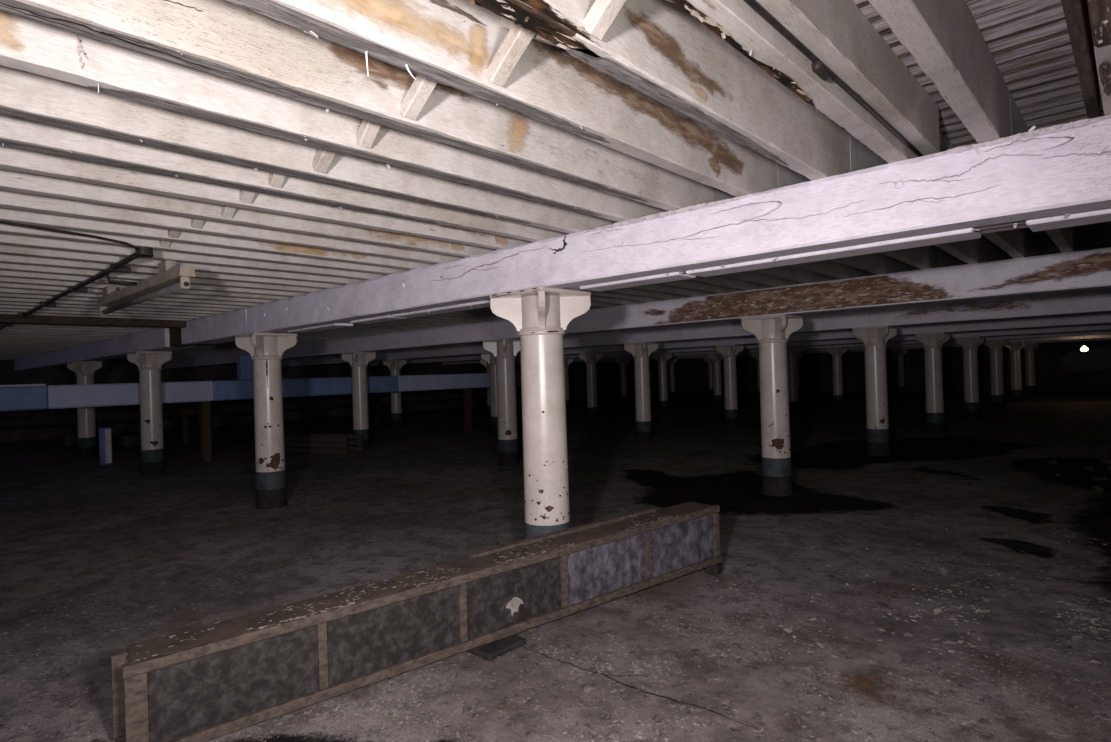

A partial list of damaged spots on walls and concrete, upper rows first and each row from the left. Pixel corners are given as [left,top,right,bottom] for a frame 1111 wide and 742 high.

crack [0,3,317,101]
damp [331,43,417,89]
peeling [0,0,789,232]
damp [342,0,491,70]
damp [433,83,466,96]
damp [532,39,743,177]
peeling [931,115,1111,157]
peeling [1089,0,1111,47]
crack [431,151,1111,281]
damp [622,453,893,517]
damp [791,436,1111,594]
damp [234,733,357,742]